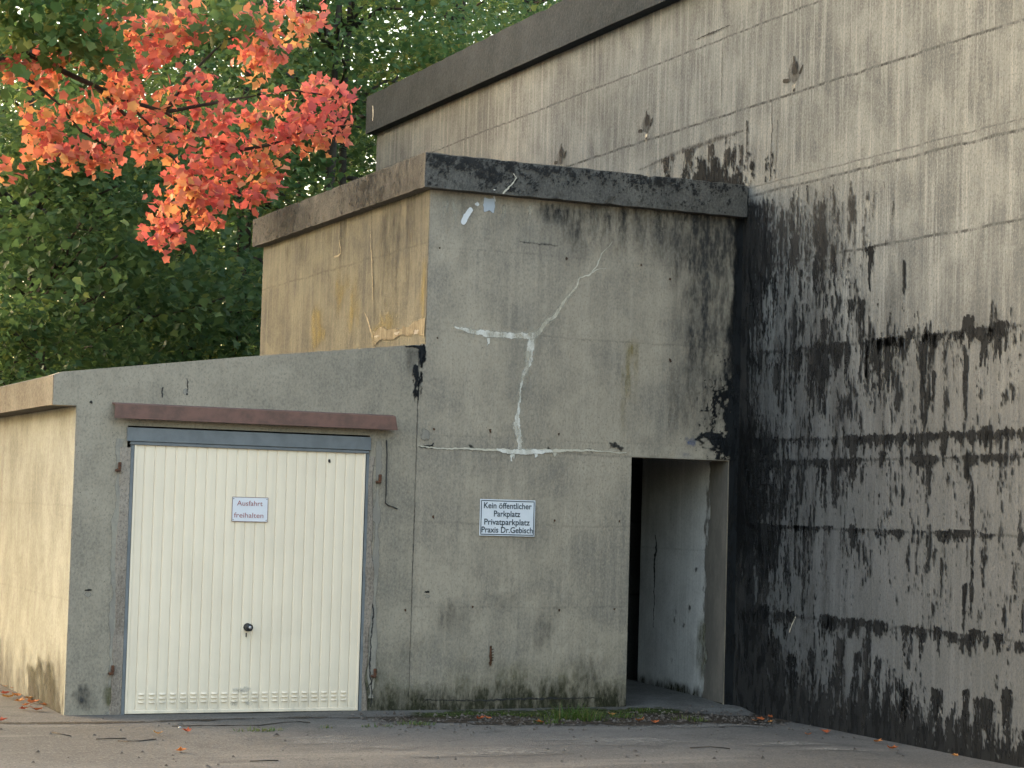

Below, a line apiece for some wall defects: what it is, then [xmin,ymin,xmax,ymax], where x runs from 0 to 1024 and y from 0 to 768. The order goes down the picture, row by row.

spalling [373,318,425,343]
damp [406,344,426,400]
crack [454,241,613,450]
damp [676,182,1024,768]
damp [367,686,626,711]
damp [637,676,702,697]